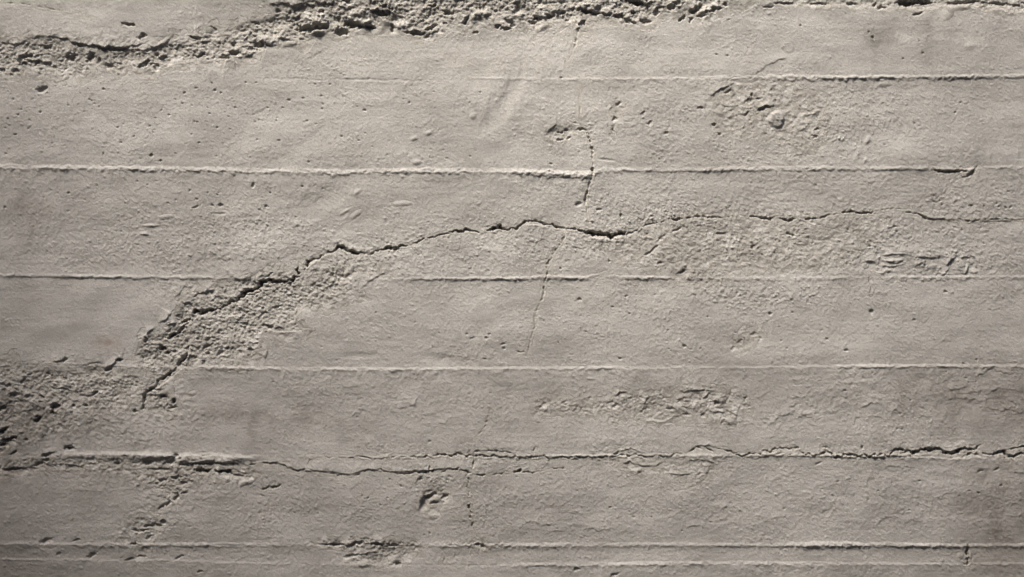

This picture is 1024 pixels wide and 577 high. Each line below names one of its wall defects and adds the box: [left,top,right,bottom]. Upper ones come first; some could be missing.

spalling [0,0,757,86]
crack [130,15,1024,417]
spalling [0,256,393,573]
crack [230,405,1024,543]